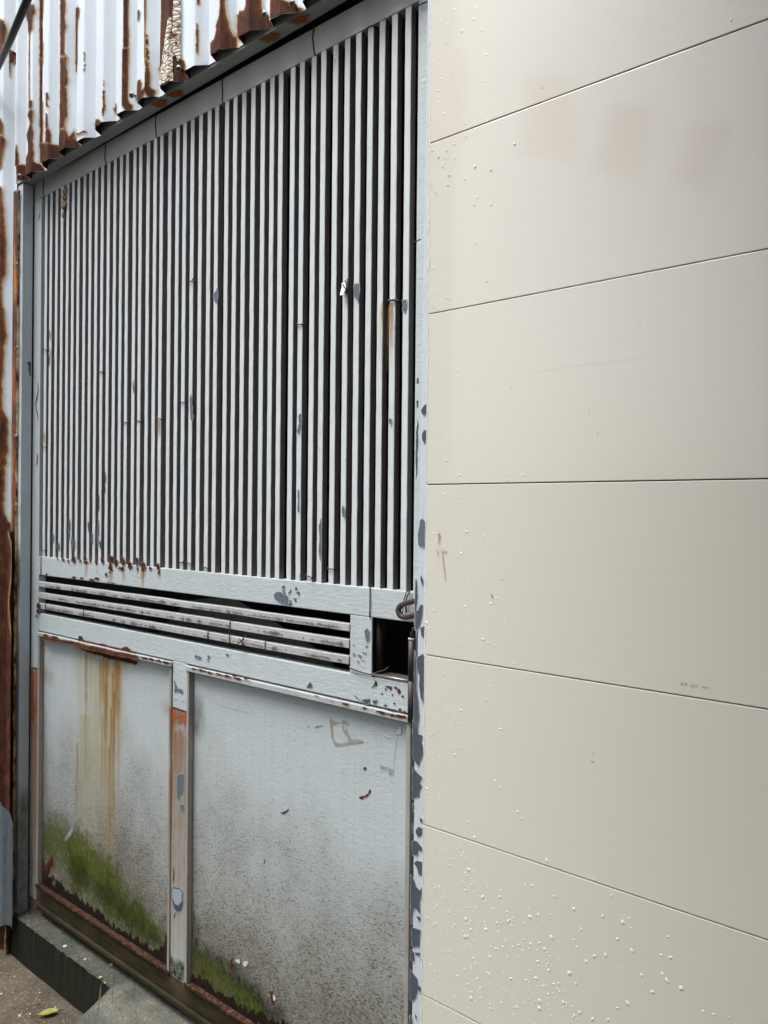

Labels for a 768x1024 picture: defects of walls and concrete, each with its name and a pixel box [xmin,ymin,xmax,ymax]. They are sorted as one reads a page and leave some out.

rust [196,0,309,54]
rust [0,0,189,180]
rust [0,186,13,814]
rust [35,556,343,662]
peeling [274,585,300,606]
rust [41,634,169,765]
rust [169,707,196,728]
rust [363,682,407,719]
peeling [383,576,426,1024]
peeling [171,887,183,912]
rust [0,925,10,955]